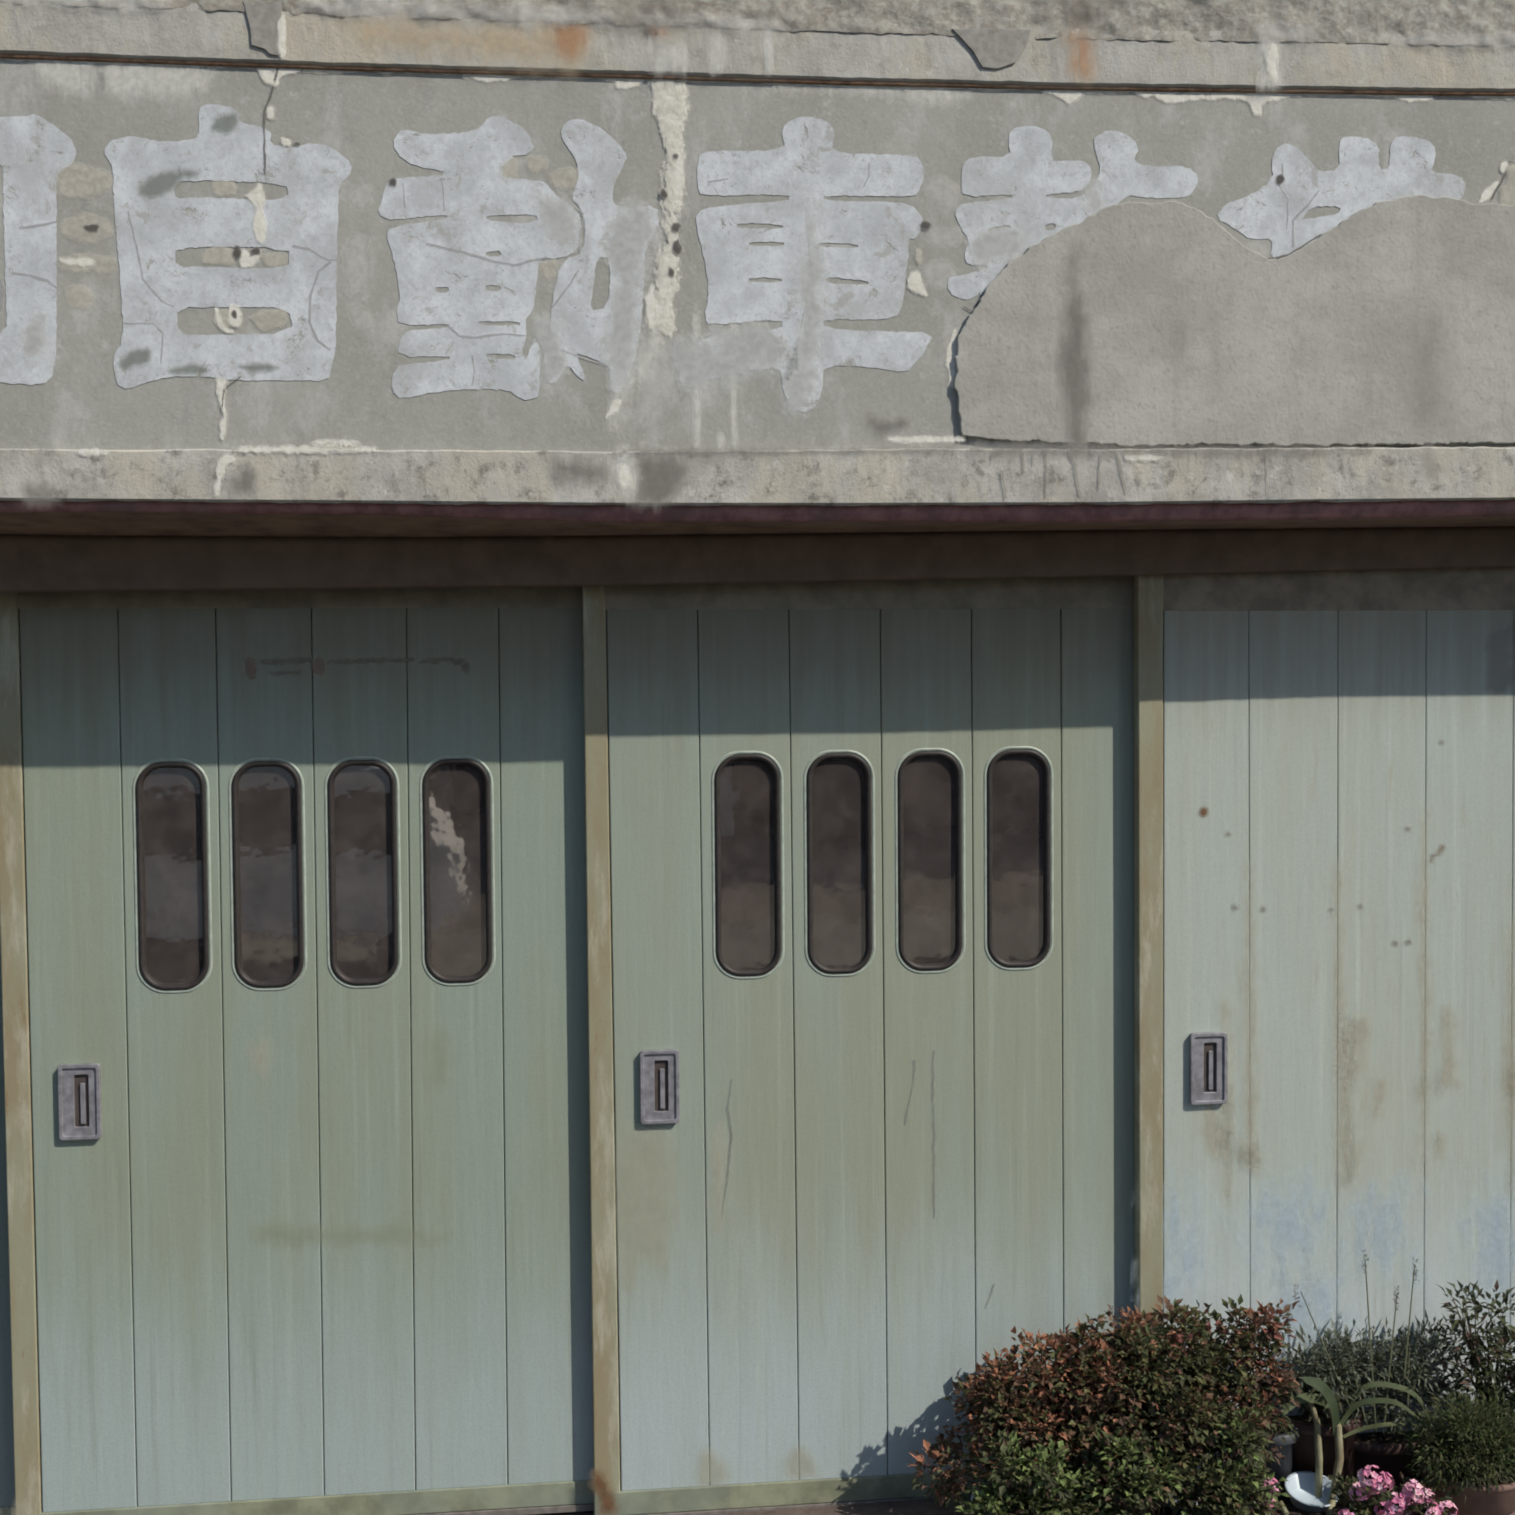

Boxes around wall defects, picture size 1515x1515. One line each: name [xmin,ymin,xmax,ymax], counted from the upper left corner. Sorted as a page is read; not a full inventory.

leakage [0,58,255,96]
leakage [725,21,1436,115]
crack [233,67,334,350]
leakage [558,19,722,420]
spalling [1479,161,1515,206]
crack [124,211,174,361]
crack [215,304,242,333]
leakage [908,250,927,296]
crack [214,376,241,496]
leakage [234,440,376,492]
leakage [871,294,1187,499]
rust [593,1472,616,1514]